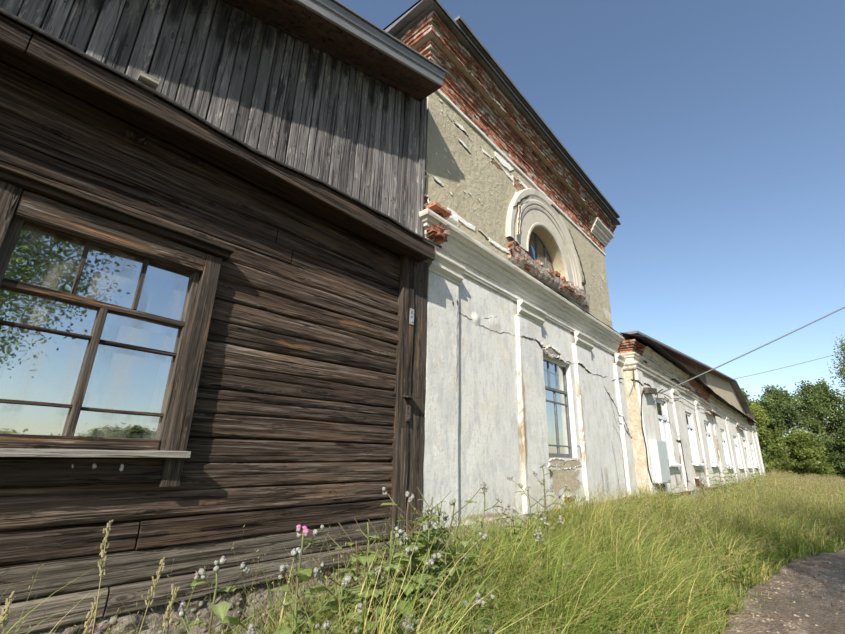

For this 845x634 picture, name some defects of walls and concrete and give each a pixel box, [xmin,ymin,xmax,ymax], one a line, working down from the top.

peeling [453,120,471,154]
flaking render [480,146,528,196]
spalling [424,194,475,245]
crack [456,312,651,488]
flaking render [547,458,582,507]